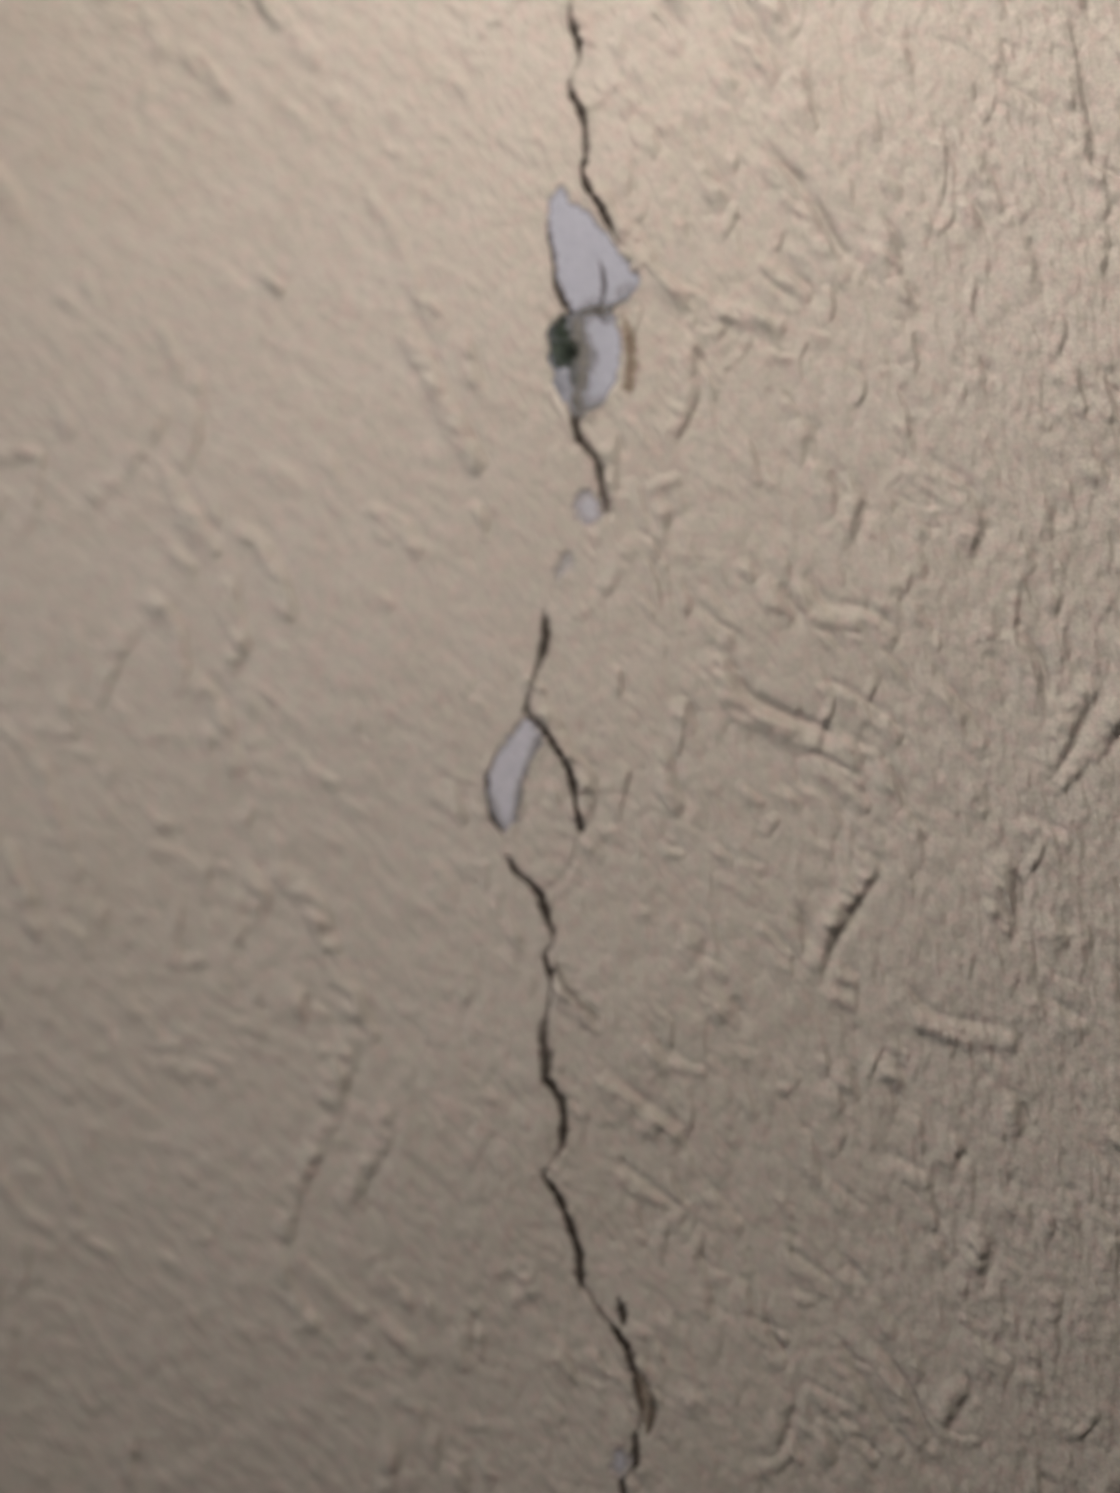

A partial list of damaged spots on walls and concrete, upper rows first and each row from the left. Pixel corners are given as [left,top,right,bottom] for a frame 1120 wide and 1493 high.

crack [548,14,614,315]
flaking render [548,187,640,424]
crack [572,415,608,511]
crack [538,617,550,665]
flaking render [471,718,543,832]
crack [526,702,584,832]
crack [485,778,554,983]
crack [540,1020,584,1287]
crack [611,1303,654,1493]